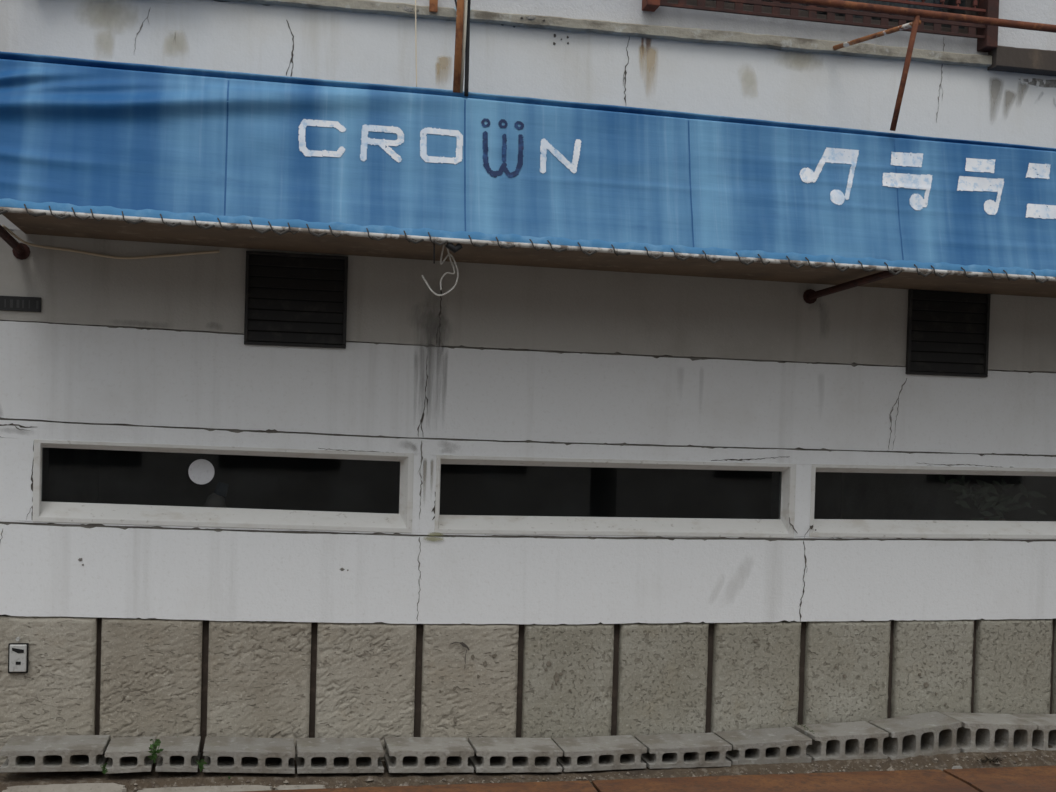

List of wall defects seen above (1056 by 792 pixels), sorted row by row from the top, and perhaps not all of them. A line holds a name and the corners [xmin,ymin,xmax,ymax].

crack [286,21,294,77]
crack [622,36,630,103]
crack [936,39,945,122]
crack [888,378,907,448]
crack [417,287,443,621]
crack [920,461,994,469]
crack [789,518,810,622]